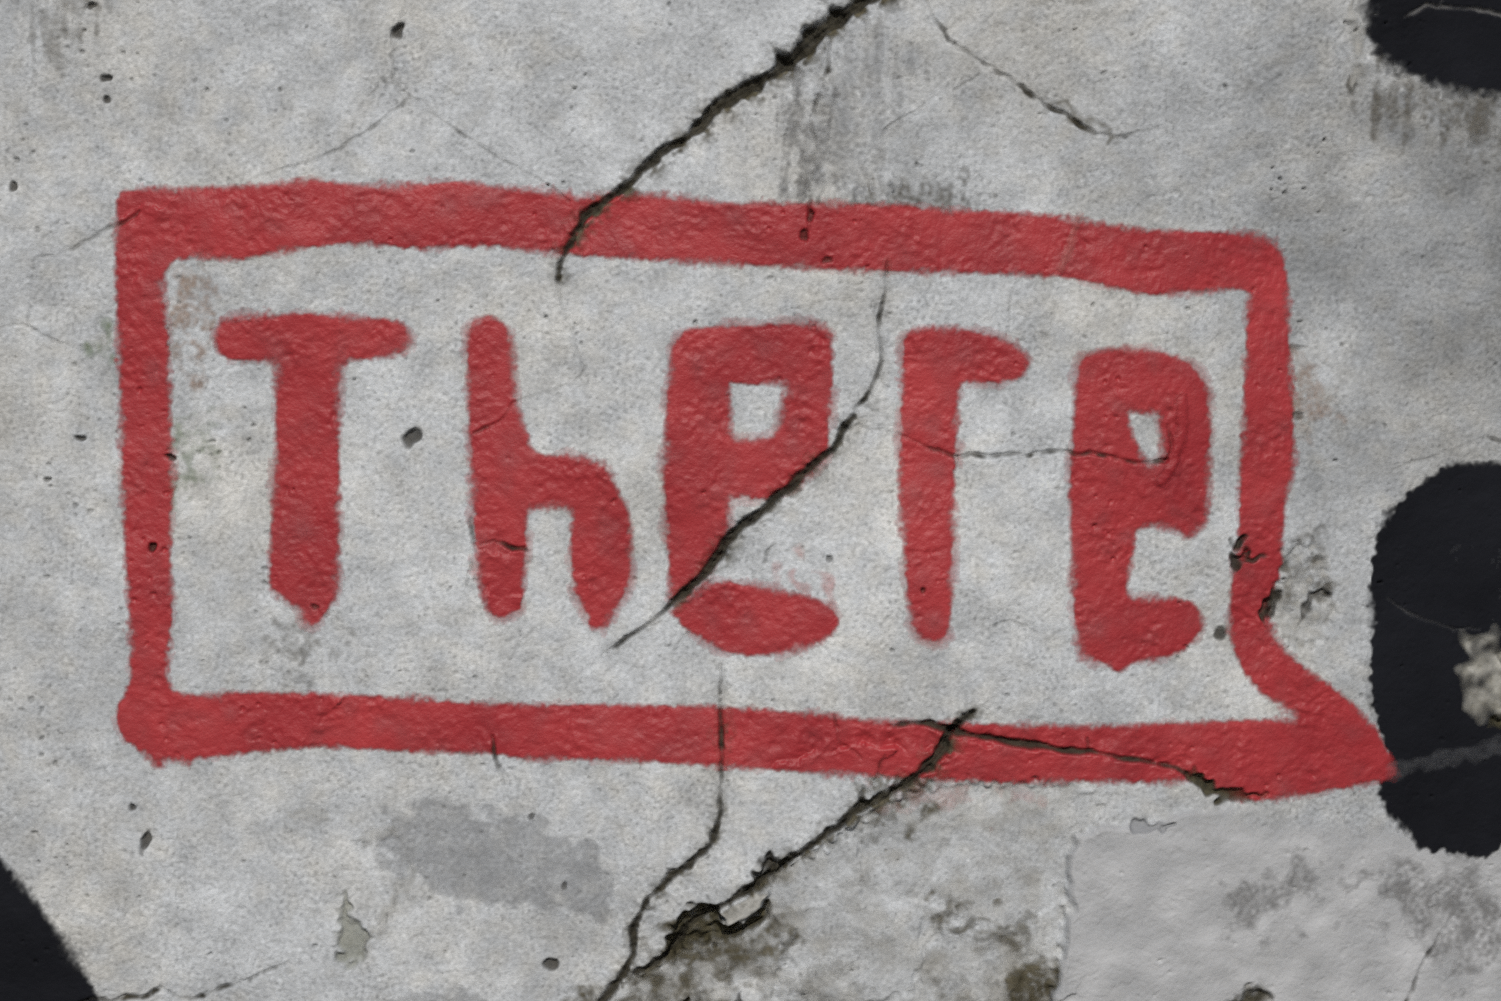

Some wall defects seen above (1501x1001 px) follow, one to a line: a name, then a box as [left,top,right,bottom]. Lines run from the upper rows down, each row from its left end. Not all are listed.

crack [556,0,897,282]
crack [1020,85,1088,130]
crack [971,450,1105,458]
crack [615,363,881,647]
spalling [1461,636,1501,727]
crack [599,709,1186,1001]
spalling [623,851,799,1001]
spalling [1005,964,1059,1001]
spalling [1242,989,1269,1001]